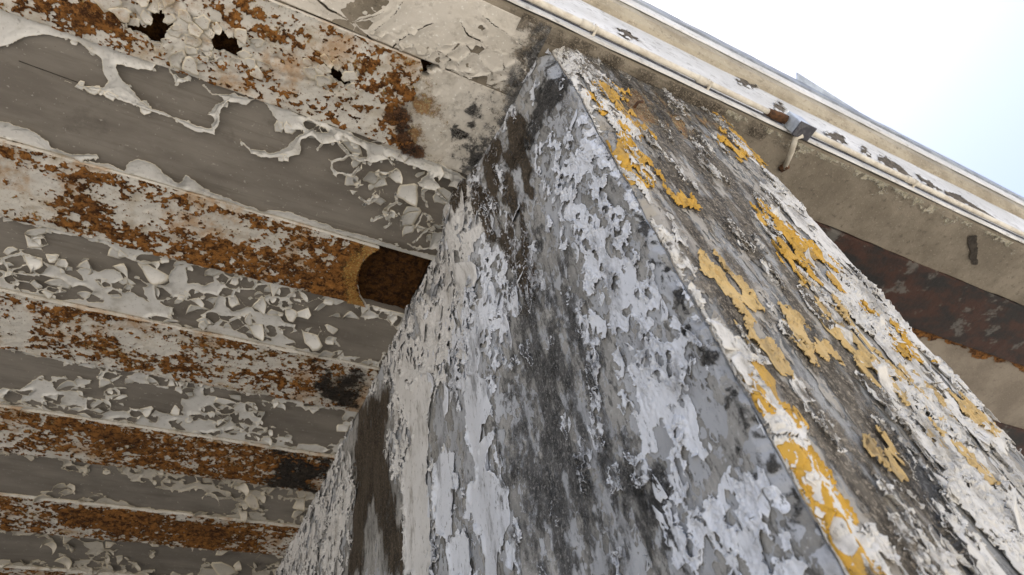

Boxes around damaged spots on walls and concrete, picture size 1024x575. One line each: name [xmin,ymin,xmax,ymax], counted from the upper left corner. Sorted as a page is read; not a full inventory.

corrosion [0,0,454,159]
corrosion [0,292,379,409]
corrosion [0,145,431,309]
peeling [0,0,546,575]
damp [442,13,993,575]
peeling [534,46,1024,575]
corrosion [908,328,1024,372]
corrosion [0,495,300,556]
corrosion [0,407,335,493]
damp [347,385,405,575]